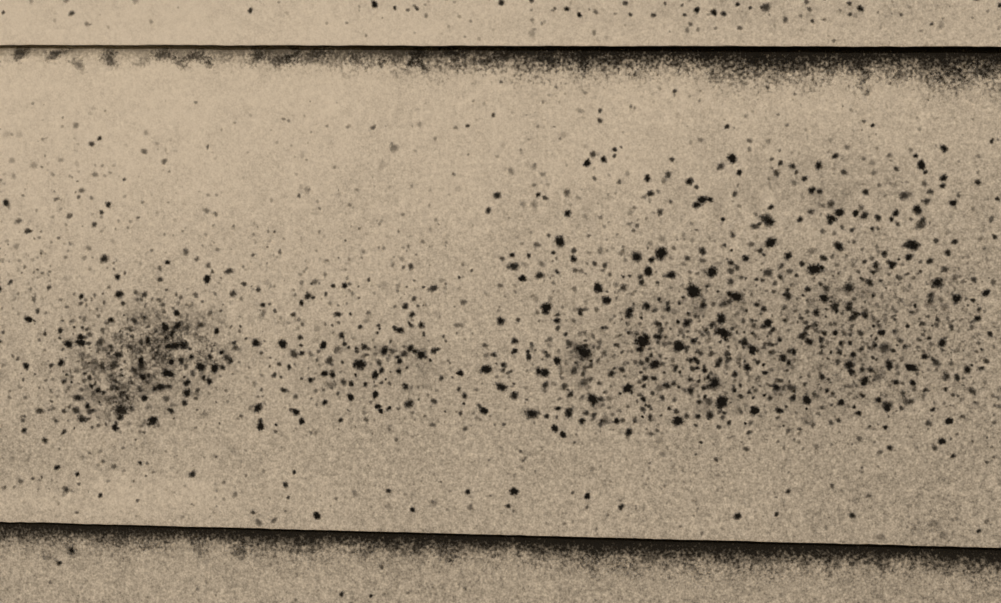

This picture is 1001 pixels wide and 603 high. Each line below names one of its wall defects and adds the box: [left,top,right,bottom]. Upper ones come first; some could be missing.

damp [583,147,617,167]
damp [49,260,262,433]
damp [254,403,277,432]
damp [269,280,351,424]
damp [301,286,447,414]
damp [481,154,995,443]